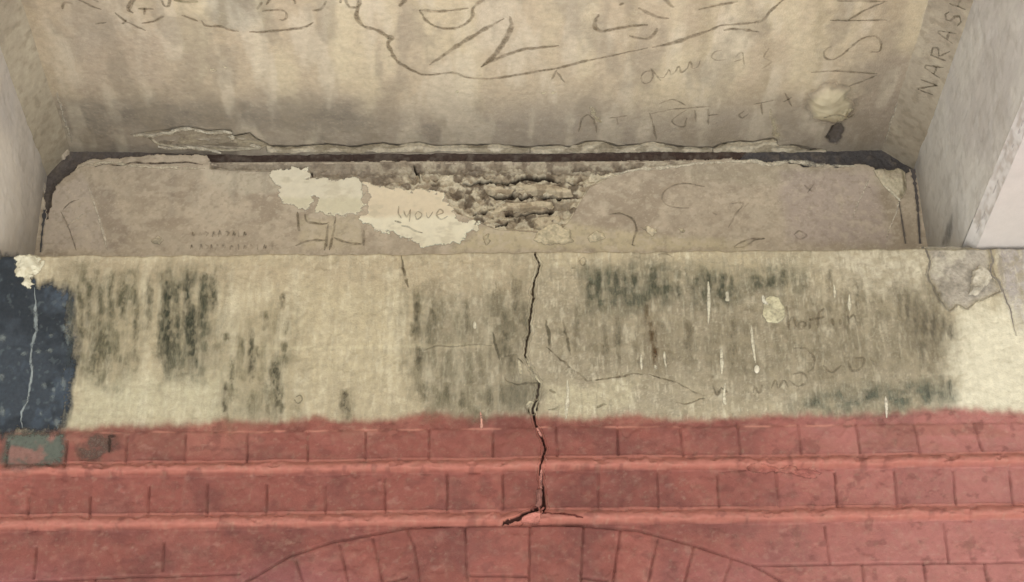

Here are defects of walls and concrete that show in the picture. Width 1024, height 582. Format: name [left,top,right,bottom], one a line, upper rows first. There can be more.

spalling [76,127,857,248]
crack [20,287,38,428]
flaking render [14,254,45,289]
leakage [70,275,136,381]
leakage [159,273,215,369]
crack [493,252,583,527]
leakage [586,268,678,312]
leakage [835,383,950,410]
flaking render [925,246,1001,311]